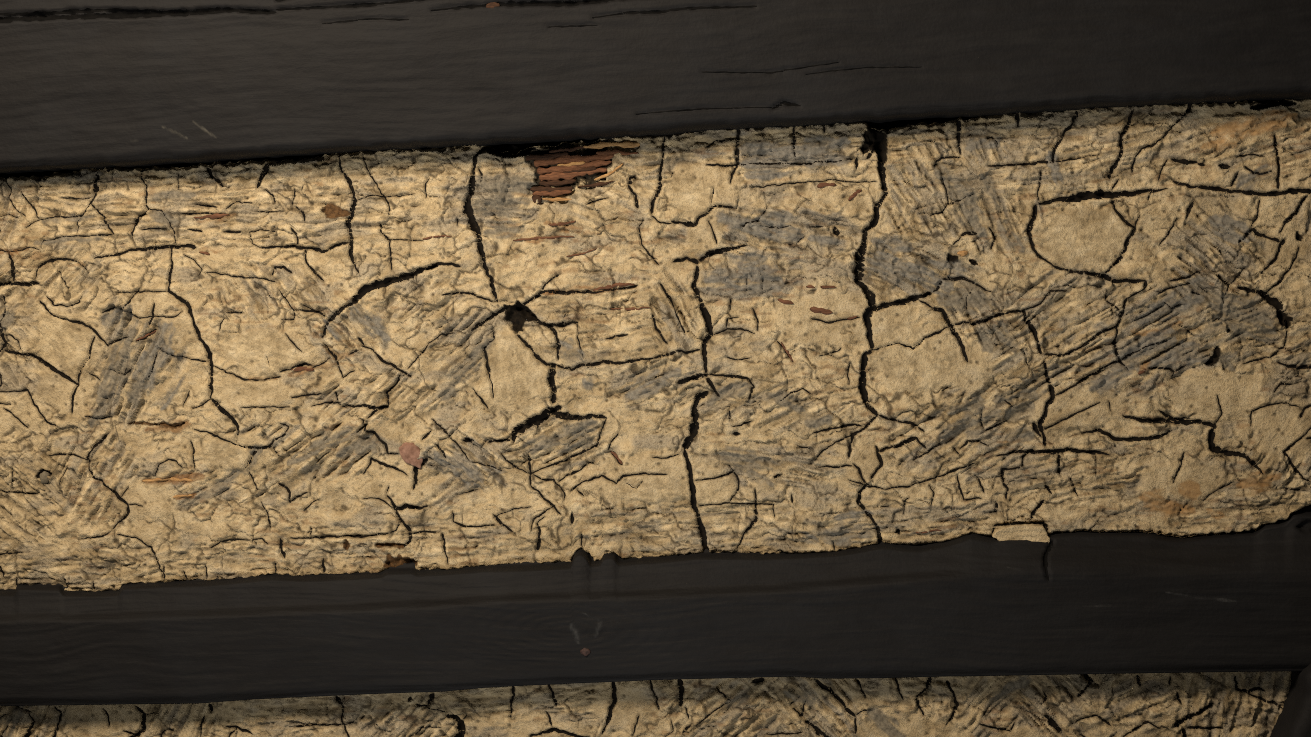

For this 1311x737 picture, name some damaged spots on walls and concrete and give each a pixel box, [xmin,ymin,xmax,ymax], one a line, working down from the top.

spalling [487,139,640,204]
crack [0,62,1311,580]
crack [0,552,24,585]
crack [0,706,62,737]
crack [103,703,252,737]
crack [296,696,365,737]
crack [408,694,467,737]
crack [510,678,764,737]
crack [767,679,870,737]
crack [895,674,1283,737]